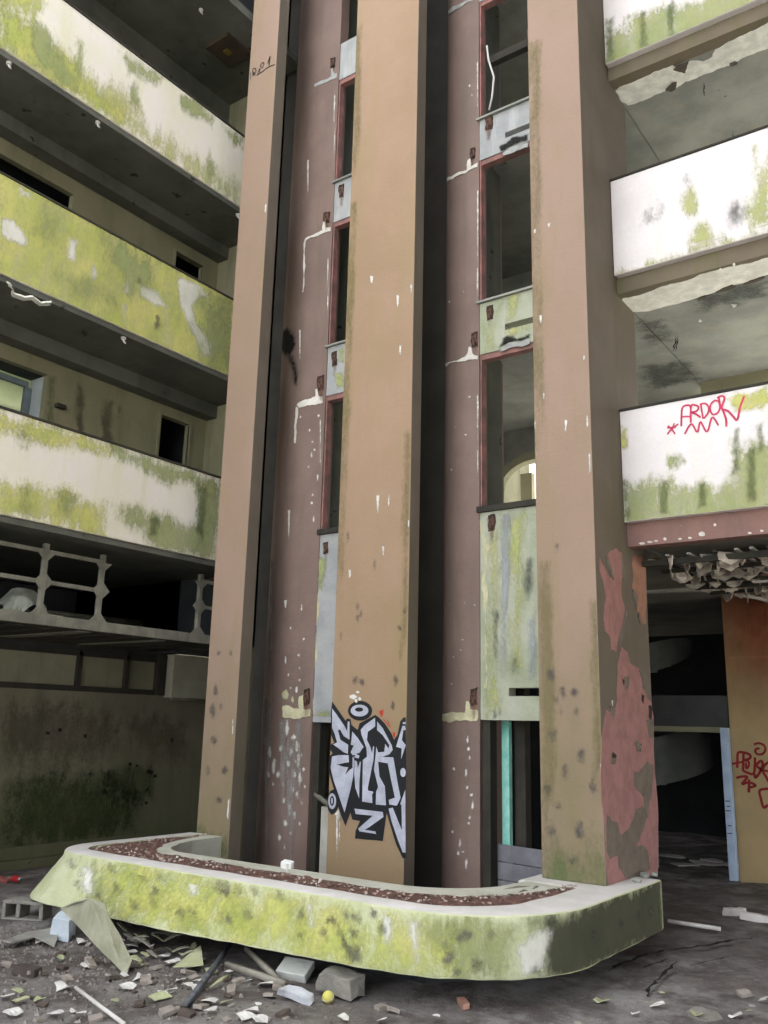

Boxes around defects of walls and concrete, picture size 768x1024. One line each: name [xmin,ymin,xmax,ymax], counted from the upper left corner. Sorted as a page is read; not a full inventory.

water stain [32,24,82,87]
peeling [616,23,768,105]
water stain [2,219,27,245]
water stain [68,239,77,260]
water stain [125,279,166,306]
water stain [178,278,212,356]
water stain [197,487,205,536]
peeling [599,523,716,885]
water stain [82,867,92,893]
water stain [383,916,391,939]
water stain [518,919,552,974]
crack [609,937,753,996]